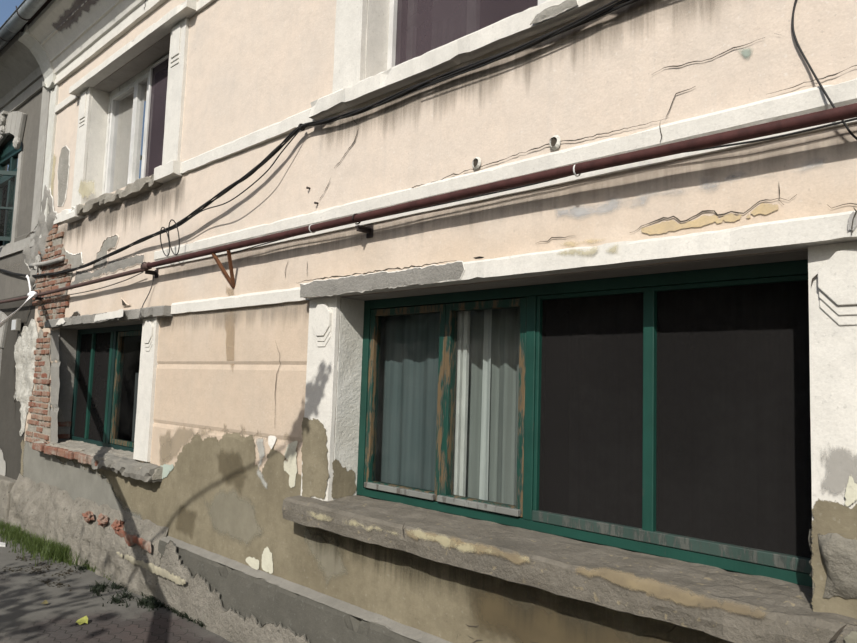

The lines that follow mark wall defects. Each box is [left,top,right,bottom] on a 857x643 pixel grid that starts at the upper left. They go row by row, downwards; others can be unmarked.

crack [653,33,779,74]
damp [435,61,498,97]
crack [769,65,857,94]
damp [381,89,422,119]
crack [412,86,695,188]
crack [630,187,796,233]
crack [828,203,857,251]
flaking render [14,224,145,447]
peeling [160,464,174,479]
peeling [284,441,298,488]
damp [20,417,728,643]
damp [811,448,857,619]